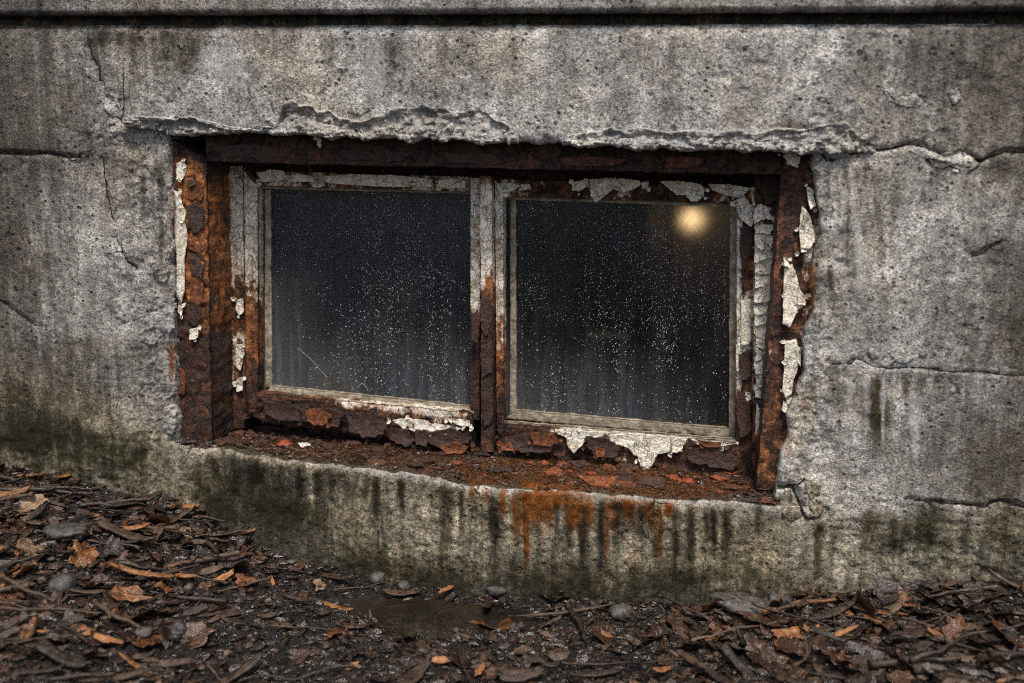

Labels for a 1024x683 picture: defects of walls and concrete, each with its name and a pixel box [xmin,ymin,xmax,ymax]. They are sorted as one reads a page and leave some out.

spalling [86,68,521,148]
spalling [562,120,876,168]
peeling [569,177,817,435]
crack [828,358,1024,376]
corrosion [255,398,475,465]
corrosion [471,297,622,548]
corrosion [681,341,761,490]
water stain [490,499,498,541]
water stain [599,502,644,544]
water stain [672,510,730,562]
crack [775,477,822,520]
crack [907,498,1024,511]